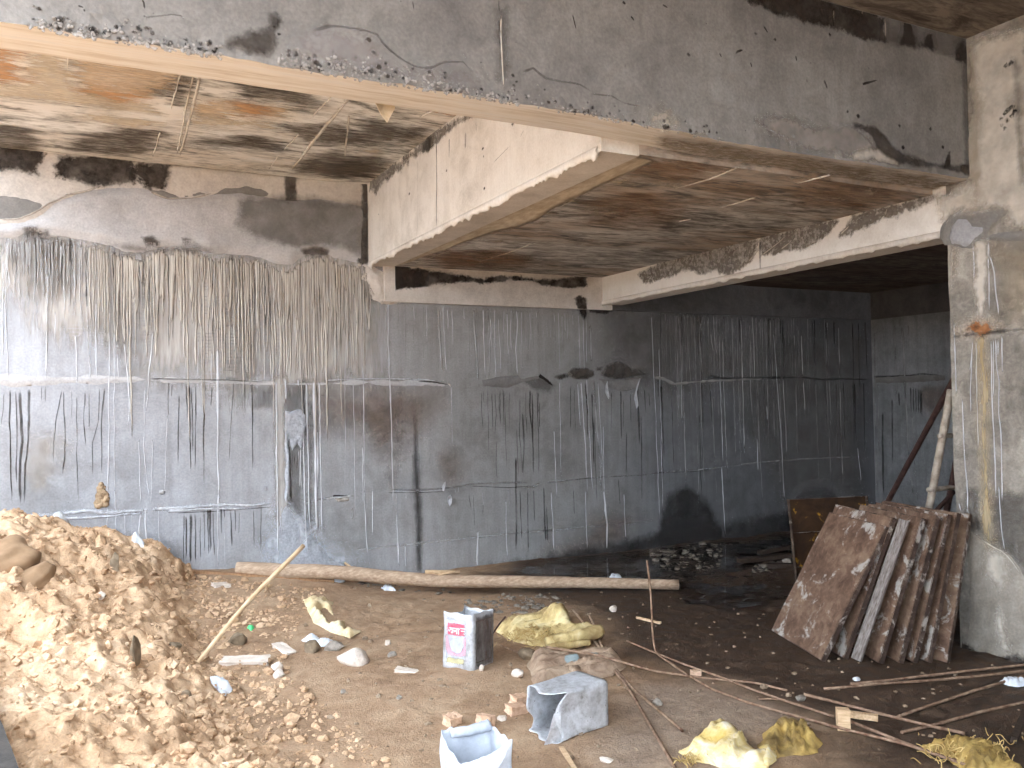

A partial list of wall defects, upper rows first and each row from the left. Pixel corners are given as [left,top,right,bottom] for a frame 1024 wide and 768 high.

spalling [50,16,218,53]
spalling [287,38,414,80]
leakage [143,75,197,106]
leakage [232,83,323,109]
leakage [0,116,470,566]
rust [967,321,990,415]
leakage [552,450,790,558]